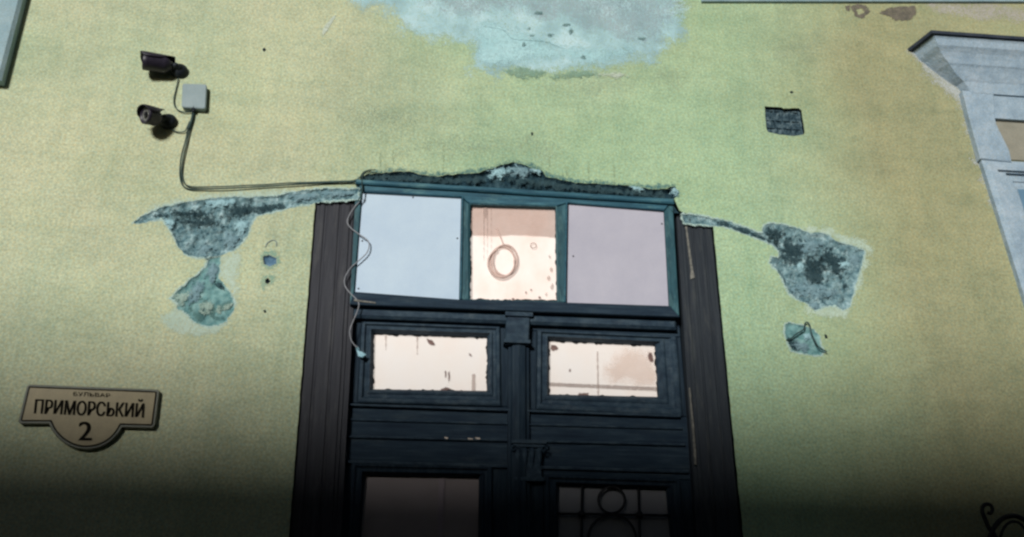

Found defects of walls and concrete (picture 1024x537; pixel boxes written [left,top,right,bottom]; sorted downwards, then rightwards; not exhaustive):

spalling [131,160,874,357]